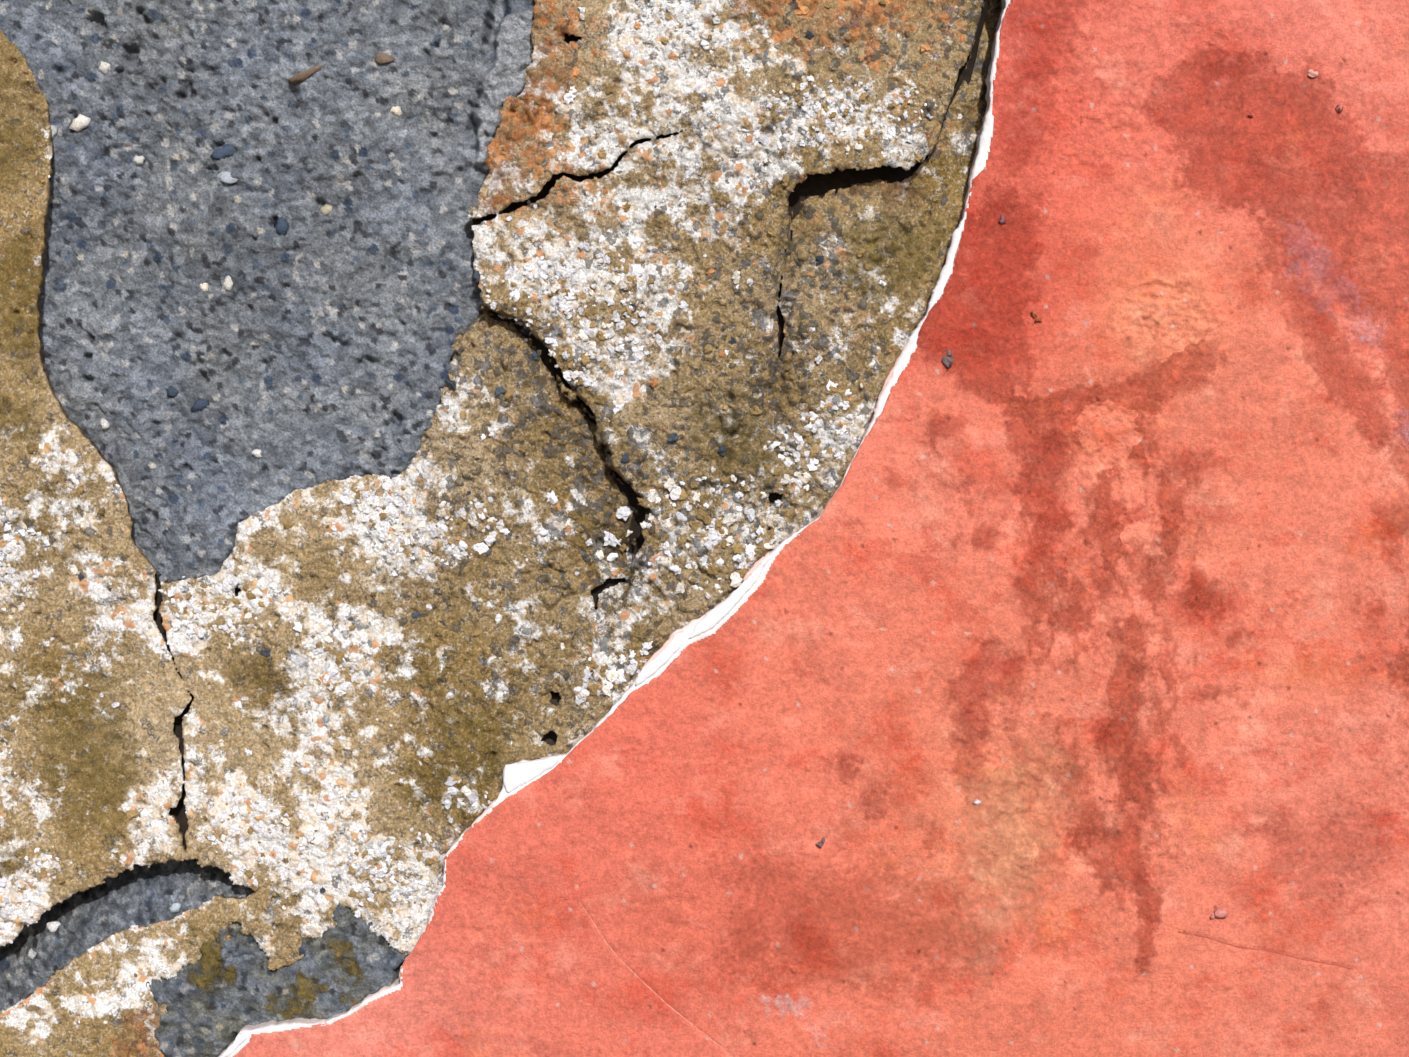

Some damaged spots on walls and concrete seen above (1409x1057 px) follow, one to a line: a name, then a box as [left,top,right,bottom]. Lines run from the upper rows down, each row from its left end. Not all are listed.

spalling [0,0,535,582]
crack [472,130,683,225]
crack [776,0,988,357]
flaking render [839,0,1011,488]
water stain [1147,48,1409,477]
spalling [0,859,255,1018]
crack [153,573,195,861]
spalling [146,903,409,1057]
crack [591,470,647,607]
flaking render [421,511,823,937]
water stain [918,184,1242,788]
water stain [1056,614,1185,972]